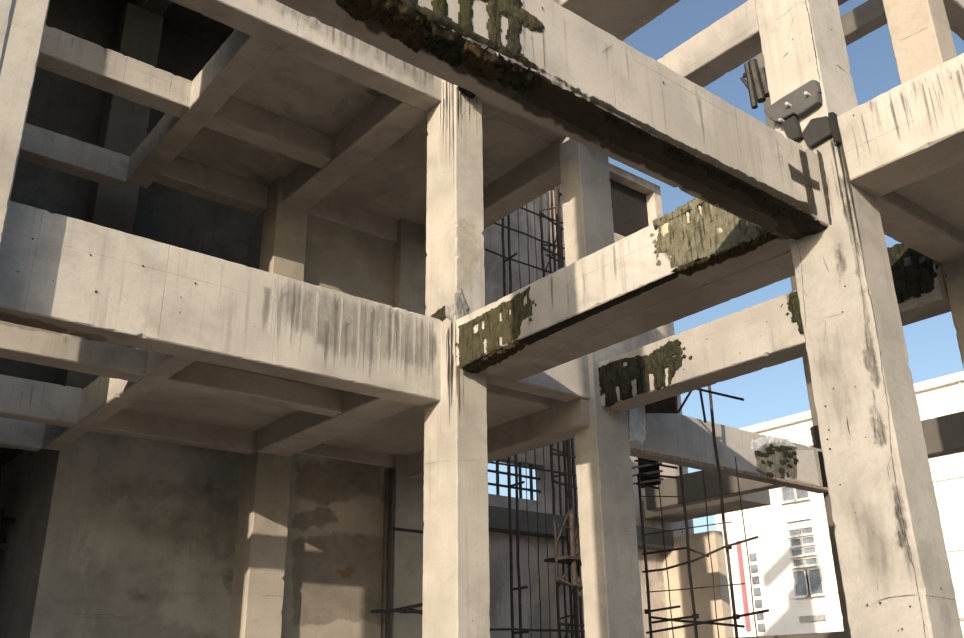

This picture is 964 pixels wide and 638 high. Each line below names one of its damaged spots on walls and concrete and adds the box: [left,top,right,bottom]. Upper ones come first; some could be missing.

spalling [605,112,650,140]
leakage [420,47,862,248]
spalling [662,142,827,235]